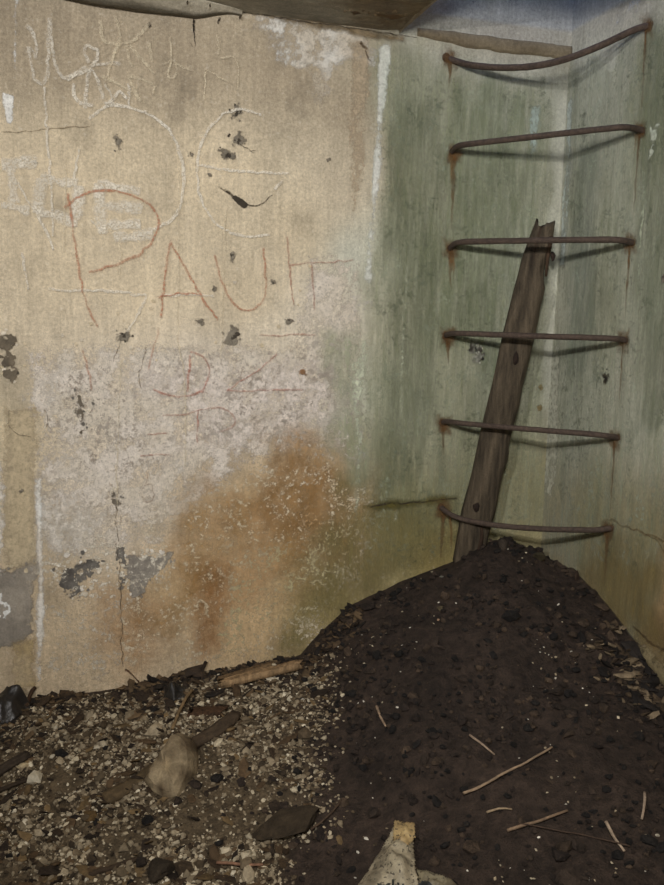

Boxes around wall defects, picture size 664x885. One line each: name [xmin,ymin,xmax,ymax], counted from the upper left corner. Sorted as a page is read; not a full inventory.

water stain [530,107,539,149]
peeling [0,253,370,689]
water stain [544,345,560,494]